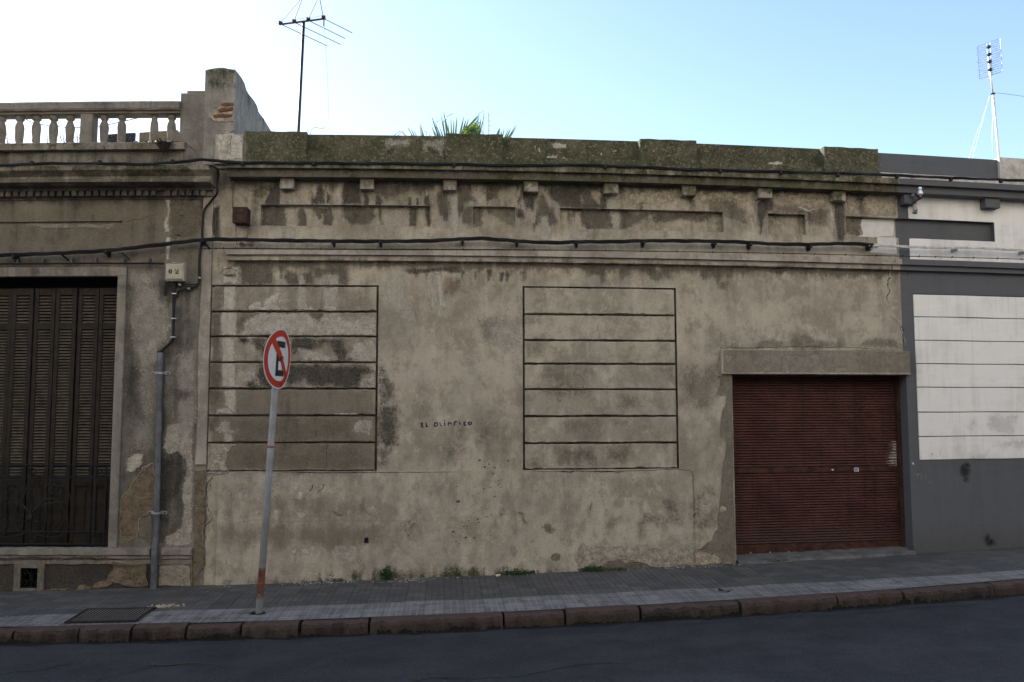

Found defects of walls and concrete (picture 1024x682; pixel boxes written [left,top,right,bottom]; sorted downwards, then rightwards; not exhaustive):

peeling [209,102,242,163]
leakage [254,181,493,239]
peeling [48,353,236,591]
leakage [211,264,347,412]
leakage [286,338,398,456]
peeling [335,413,372,435]
spalling [575,355,736,570]
peeling [754,348,847,373]
crack [715,259,906,396]